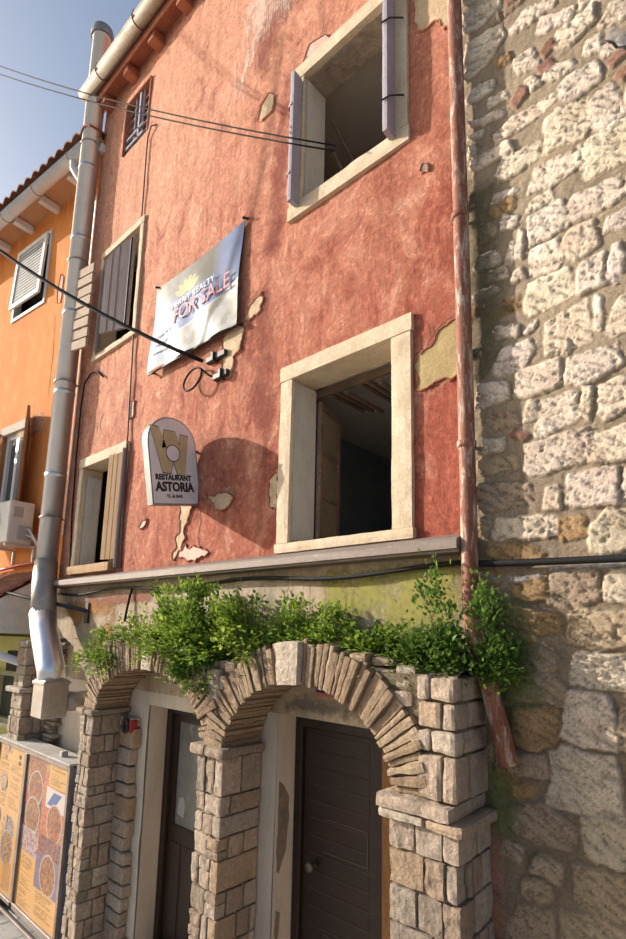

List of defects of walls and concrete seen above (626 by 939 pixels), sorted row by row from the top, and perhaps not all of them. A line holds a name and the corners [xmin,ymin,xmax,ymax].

leakage [234,0,289,99]
flaking render [411,0,448,35]
flaking render [257,92,276,123]
leakage [273,108,287,202]
flaking render [221,291,265,379]
flaking render [413,319,457,393]
flaking render [171,506,210,563]
flaking render [203,489,236,512]
flaking render [276,781,289,874]